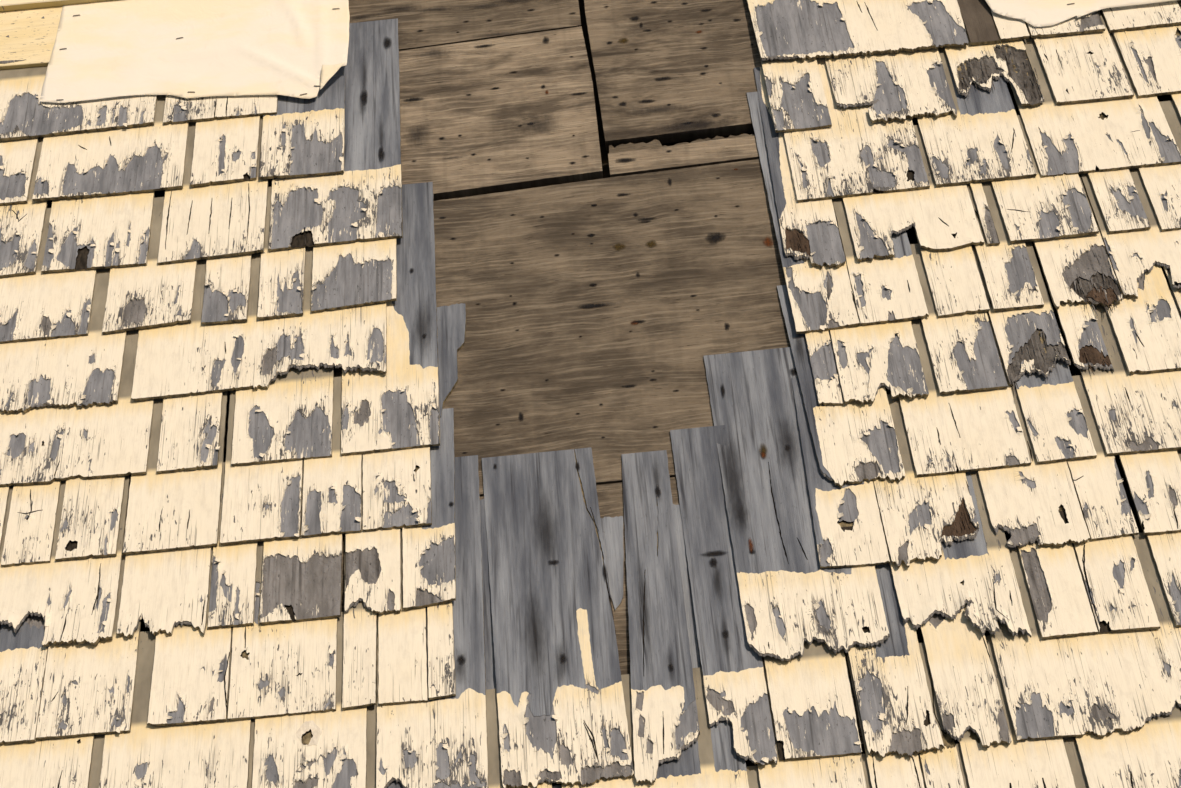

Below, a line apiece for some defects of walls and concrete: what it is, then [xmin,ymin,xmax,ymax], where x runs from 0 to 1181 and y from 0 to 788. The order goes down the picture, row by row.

peeling [906,0,969,47]
spalling [578,0,610,178]
peeling [754,0,918,197]
peeling [0,144,170,208]
peeling [218,121,402,314]
peeling [784,219,929,402]
peeling [200,335,244,465]
peeling [248,403,349,459]
peeling [378,389,439,449]
crack [583,490,645,676]
crack [583,720,599,762]
peeling [657,669,889,778]